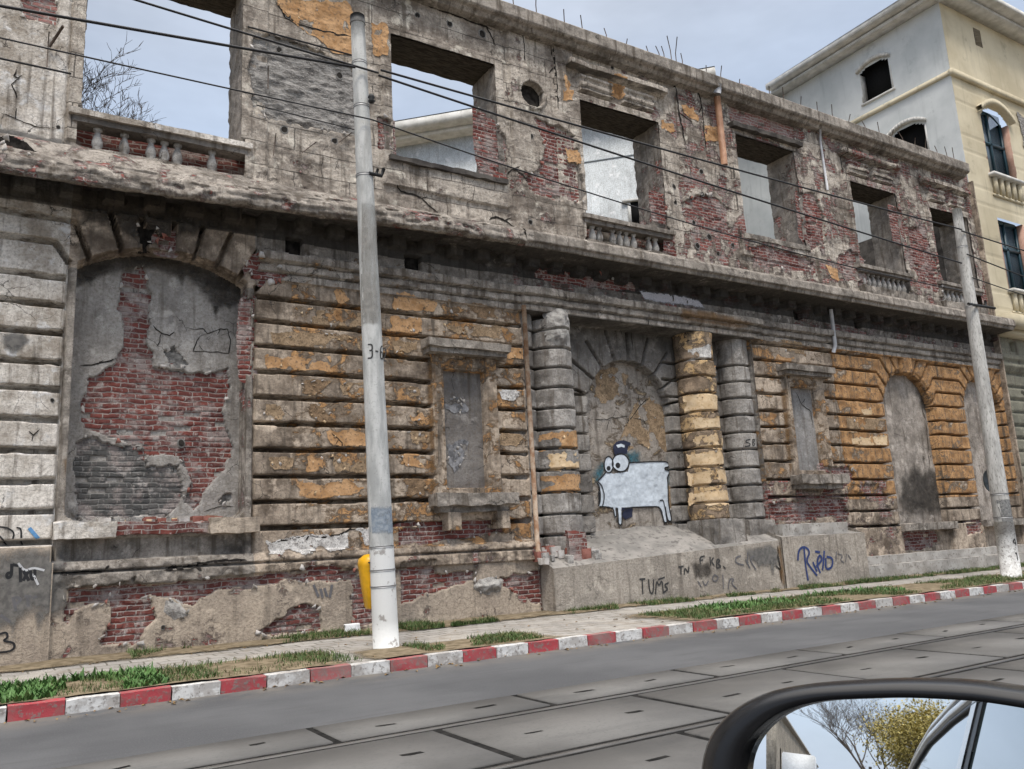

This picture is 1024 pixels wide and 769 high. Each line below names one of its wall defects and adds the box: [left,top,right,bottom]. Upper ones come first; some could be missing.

spalling [247,0,355,144]
peeling [371,22,390,57]
crack [397,185,437,212]
spalling [472,108,508,179]
spalling [526,118,585,204]
spalling [648,184,868,285]
spalling [887,205,944,293]
crack [153,325,231,354]
spalling [71,251,367,520]
peeling [841,408,888,448]
water stain [901,456,948,513]
spalling [63,528,372,647]